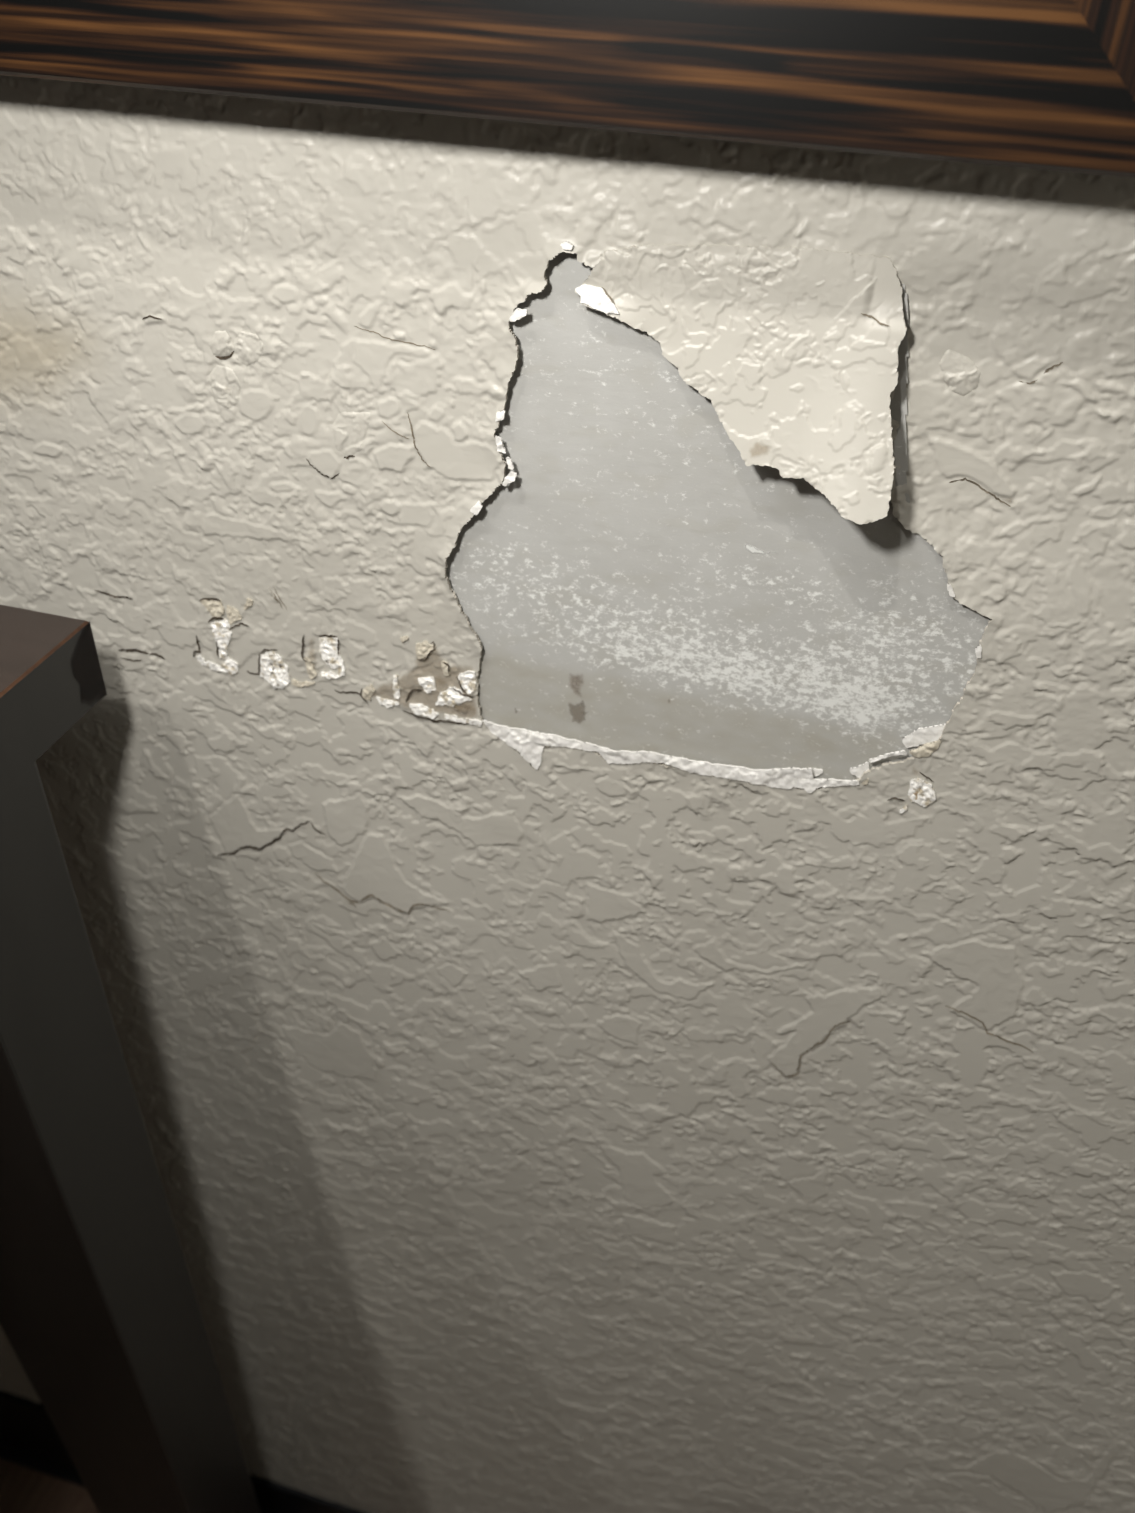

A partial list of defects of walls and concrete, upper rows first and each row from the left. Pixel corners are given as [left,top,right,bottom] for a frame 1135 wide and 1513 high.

peeling [360,241,991,814]
spalling [193,598,253,675]
spalling [258,634,345,689]